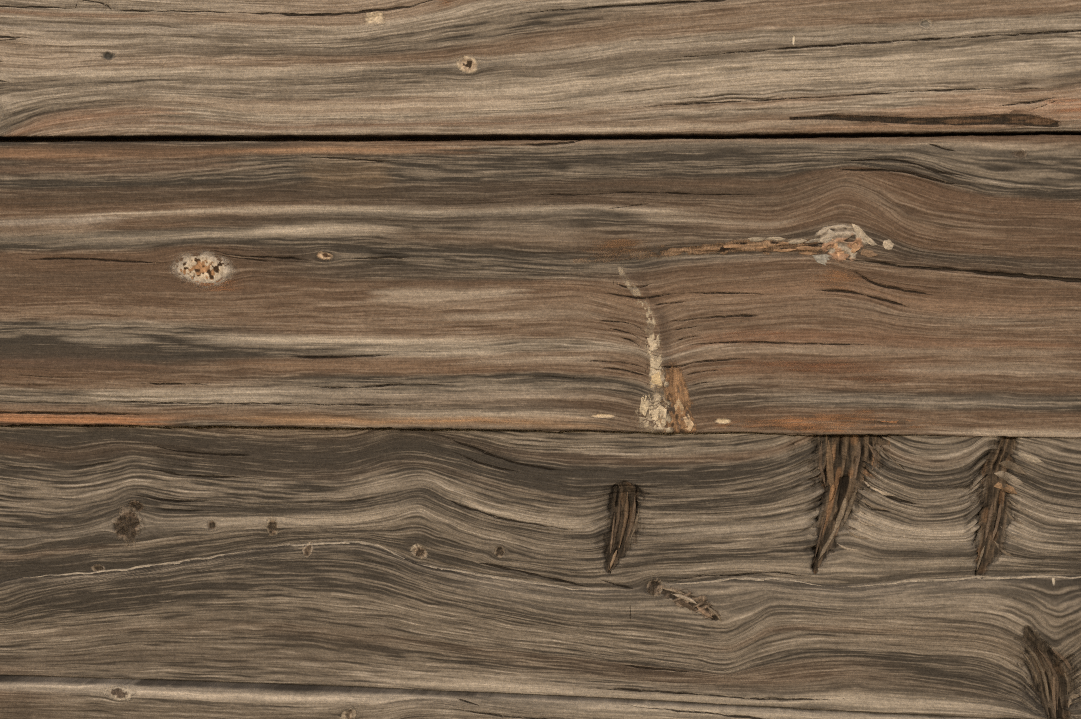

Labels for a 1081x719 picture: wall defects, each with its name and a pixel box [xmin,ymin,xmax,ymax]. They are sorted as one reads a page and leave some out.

crack [635,88,1055,117]
crack [593,280,864,386]
crack [668,434,916,583]
crack [968,436,1043,578]
crack [452,699,547,719]
crack [598,665,831,719]
crack [1015,625,1081,719]